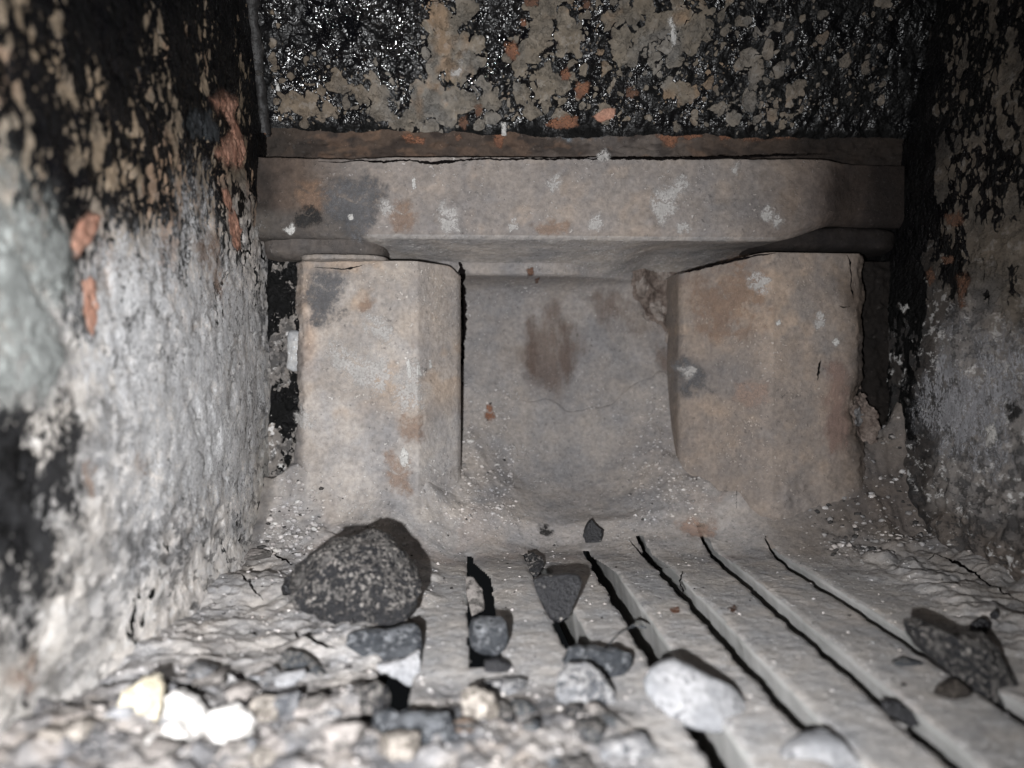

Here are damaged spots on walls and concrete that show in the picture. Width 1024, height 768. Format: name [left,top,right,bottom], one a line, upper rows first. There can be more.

corrosion [212,96,246,166]
crack [318,154,828,165]
corrosion [72,212,100,254]
corrosion [222,189,242,251]
spalling [0,195,75,411]
corrosion [82,276,99,336]
crack [458,262,468,385]